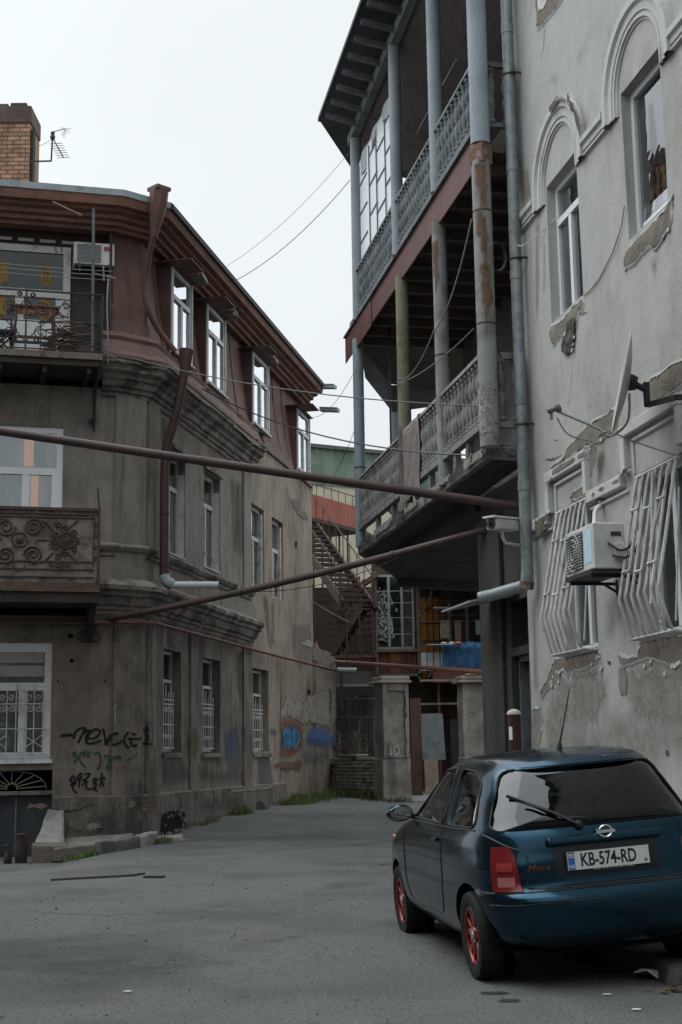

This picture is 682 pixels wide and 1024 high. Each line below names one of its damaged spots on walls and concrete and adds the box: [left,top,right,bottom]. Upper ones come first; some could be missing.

flaking render [535,0,563,32]
corrosion [474,163,493,335]
flaking render [549,296,585,356]
flaking render [647,358,682,409]
flaking render [545,406,631,503]
peeling [281,686,337,729]
peeling [531,635,682,749]